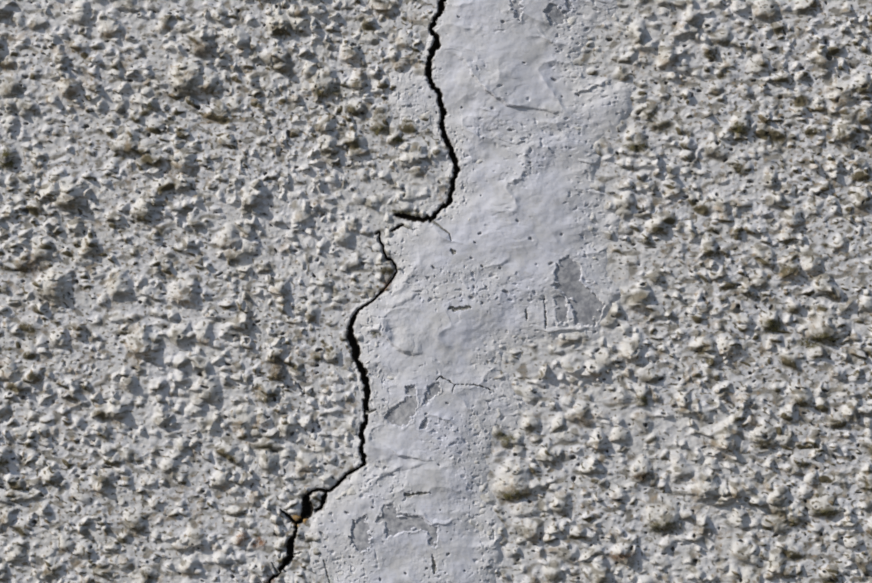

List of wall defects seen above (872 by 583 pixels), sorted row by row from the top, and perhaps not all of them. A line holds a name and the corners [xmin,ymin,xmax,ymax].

crack [268,0,460,583]
spalling [555,256,604,326]
spalling [385,383,441,426]
crack [436,376,492,392]